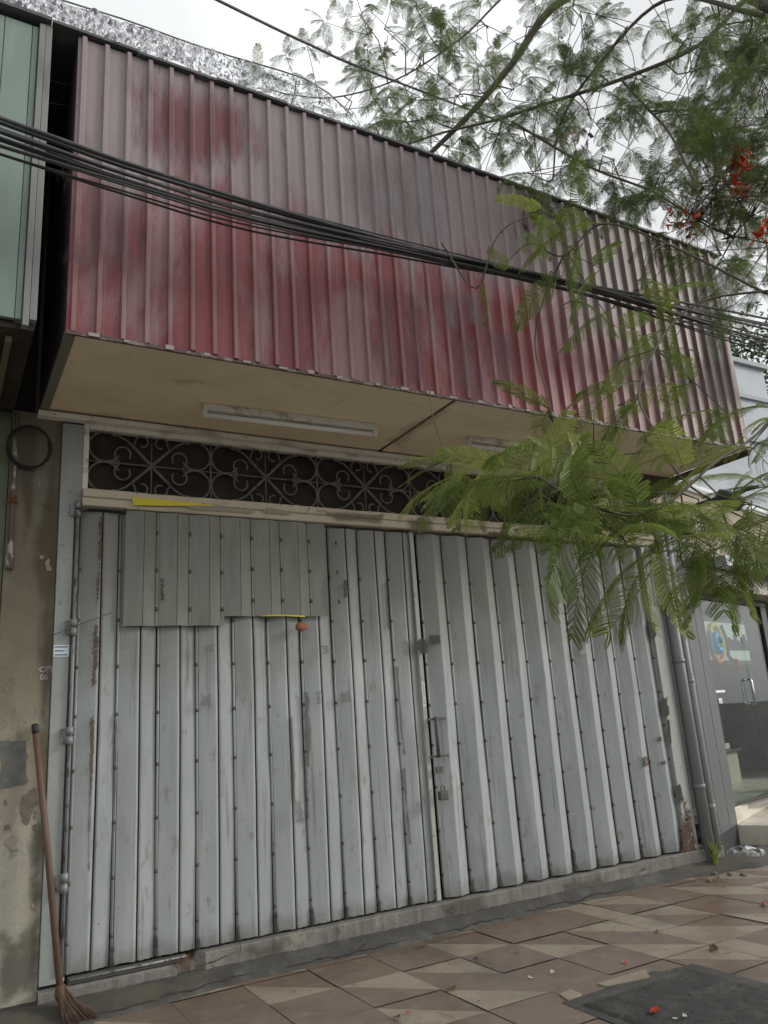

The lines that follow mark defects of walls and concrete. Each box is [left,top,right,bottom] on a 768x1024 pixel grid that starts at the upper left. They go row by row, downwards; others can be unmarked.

corrosion [91,625,100,686]
peeling [0,786,38,860]
corrosion [675,784,697,853]
crack [272,933,407,968]